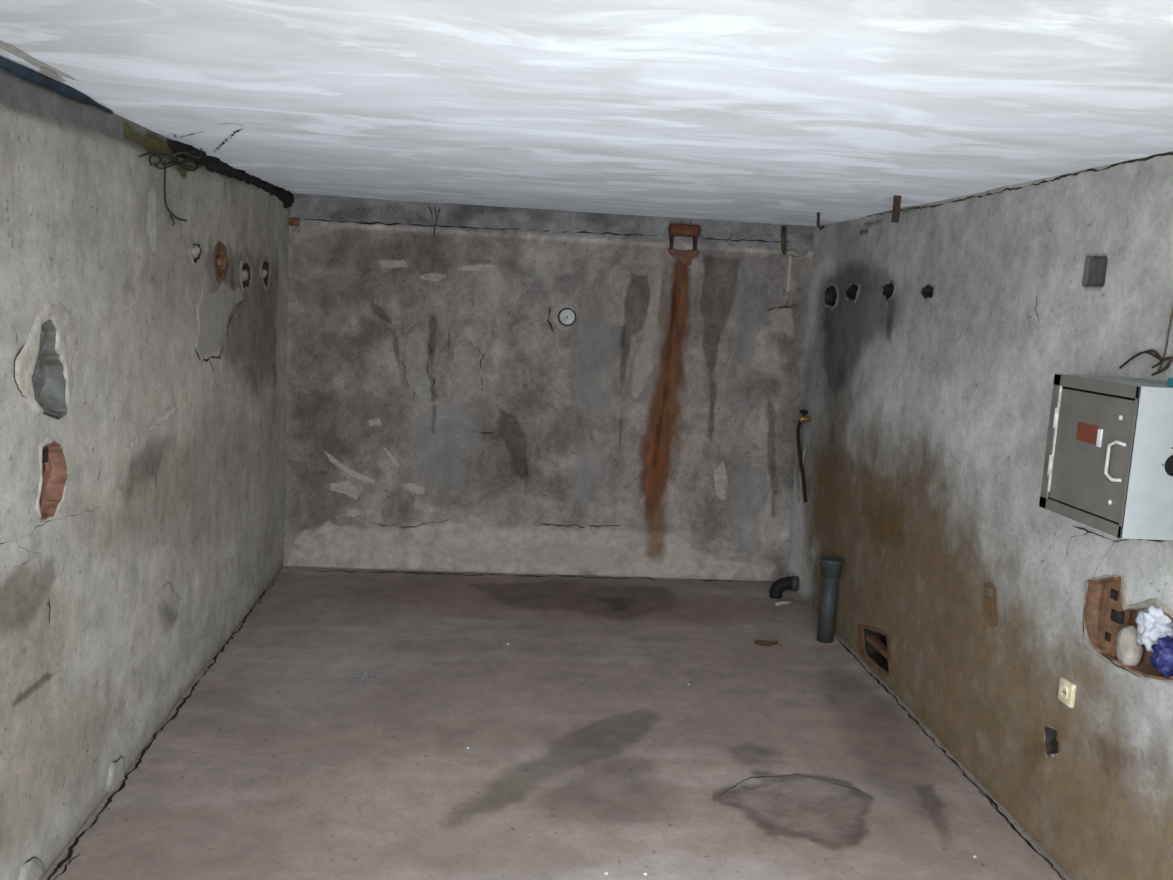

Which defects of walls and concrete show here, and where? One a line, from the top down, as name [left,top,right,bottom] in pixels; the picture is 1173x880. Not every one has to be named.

spalling [14,300,77,419]
peeling [188,240,271,387]
corrosion [641,258,688,519]
spalling [35,437,69,521]
water stain [808,434,1173,880]
spalling [1082,574,1173,681]